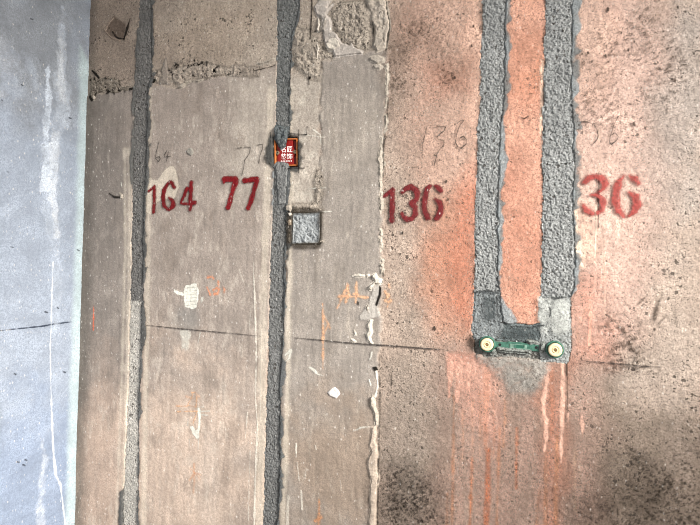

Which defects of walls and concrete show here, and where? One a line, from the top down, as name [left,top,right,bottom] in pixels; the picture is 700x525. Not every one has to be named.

flaking render [292,0,391,214]
spalling [286,168,332,216]
corrosion [452,361,562,525]